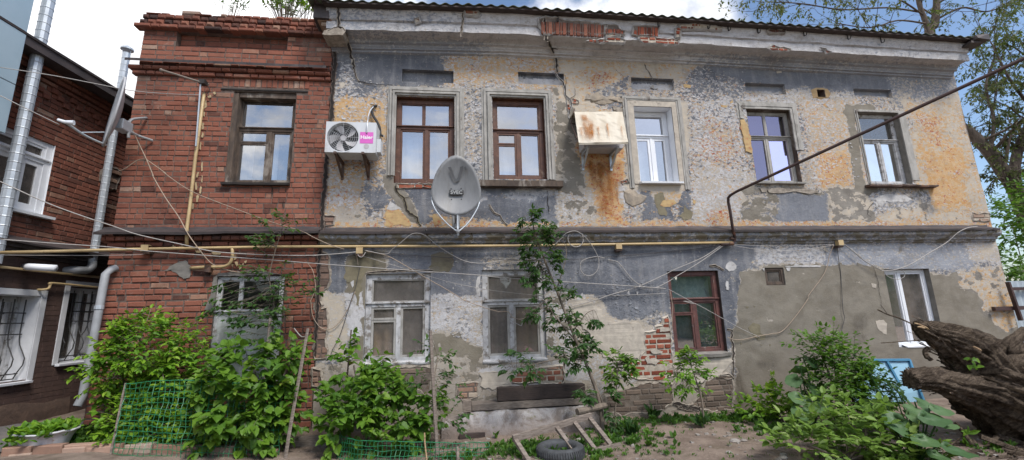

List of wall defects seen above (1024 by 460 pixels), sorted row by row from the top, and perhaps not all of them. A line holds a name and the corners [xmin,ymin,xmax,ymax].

flaking render [385,201,411,227]
peeling [660,198,696,220]